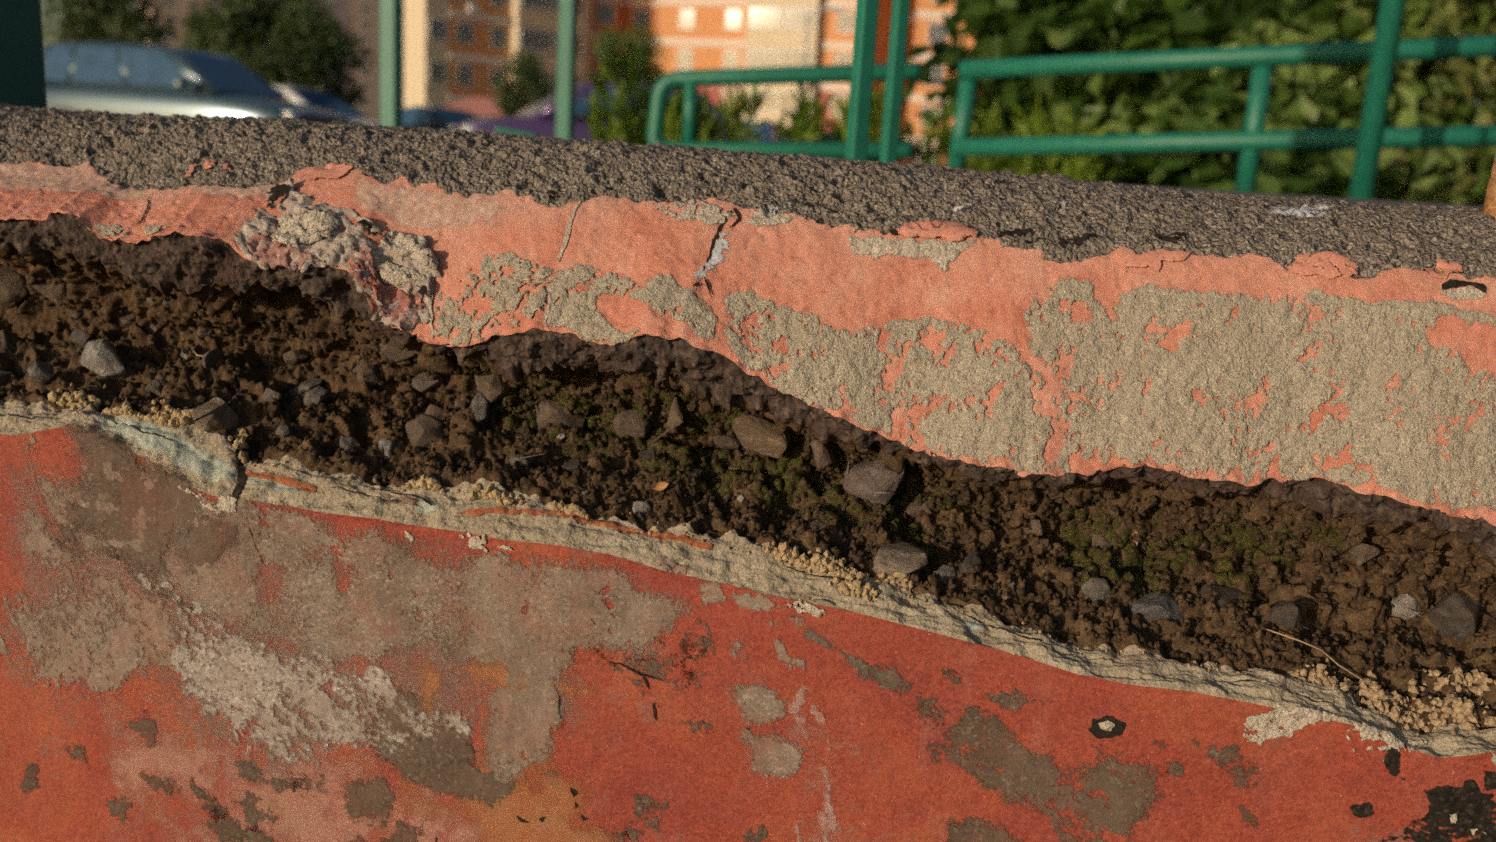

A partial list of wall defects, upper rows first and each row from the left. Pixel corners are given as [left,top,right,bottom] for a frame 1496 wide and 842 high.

corrosion [1482,160,1496,220]
crack [427,277,435,339]
crack [543,201,581,328]
crack [693,208,741,297]
peeling [0,177,1496,809]